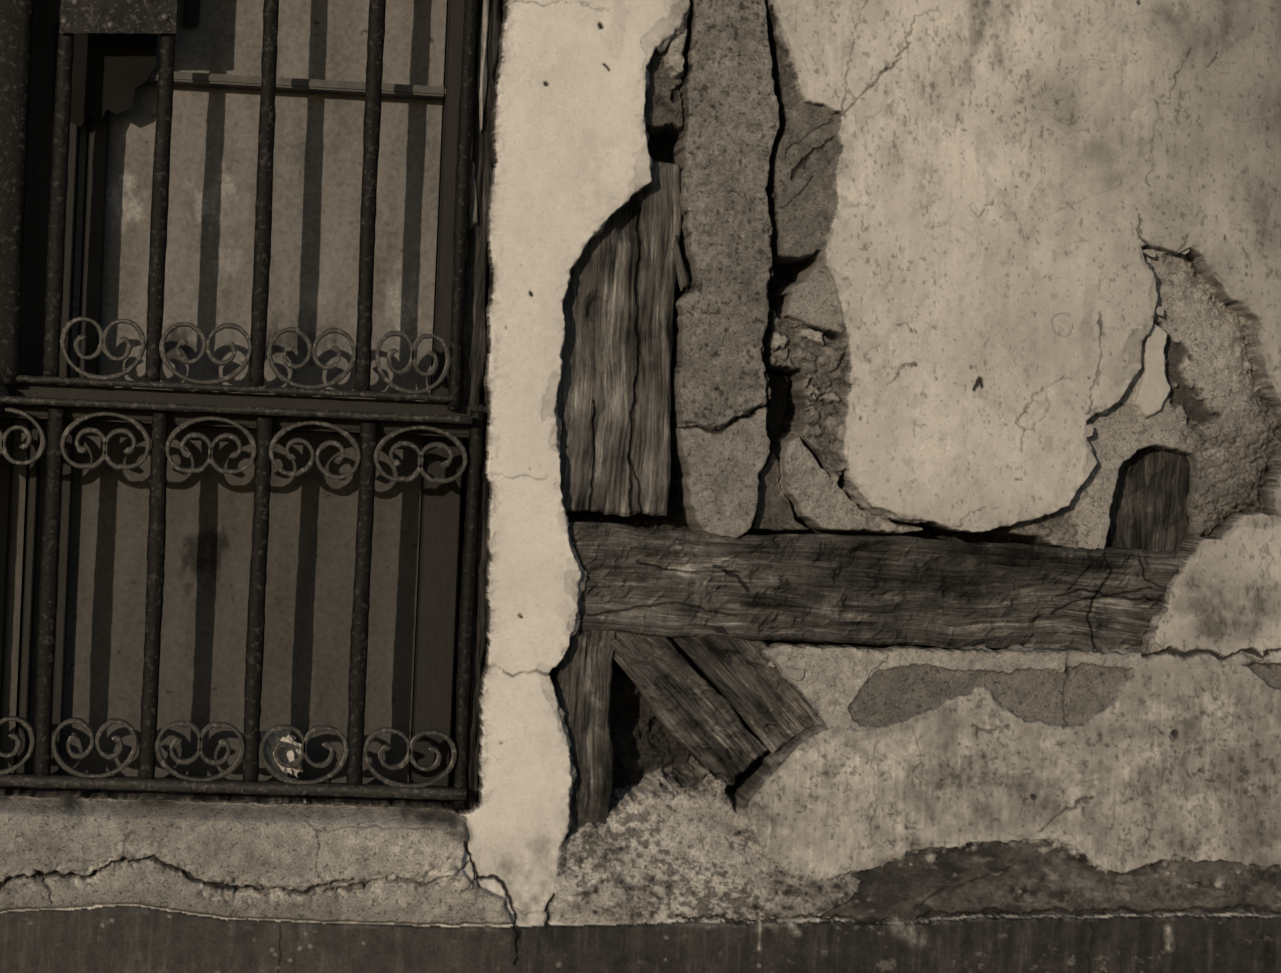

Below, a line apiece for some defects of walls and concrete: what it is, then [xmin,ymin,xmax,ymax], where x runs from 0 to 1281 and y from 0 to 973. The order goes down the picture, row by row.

crack [667,1,696,103]
crack [765,0,943,299]
crack [670,348,771,435]
crack [864,323,919,387]
spalling [544,0,1281,925]
crack [0,820,556,973]